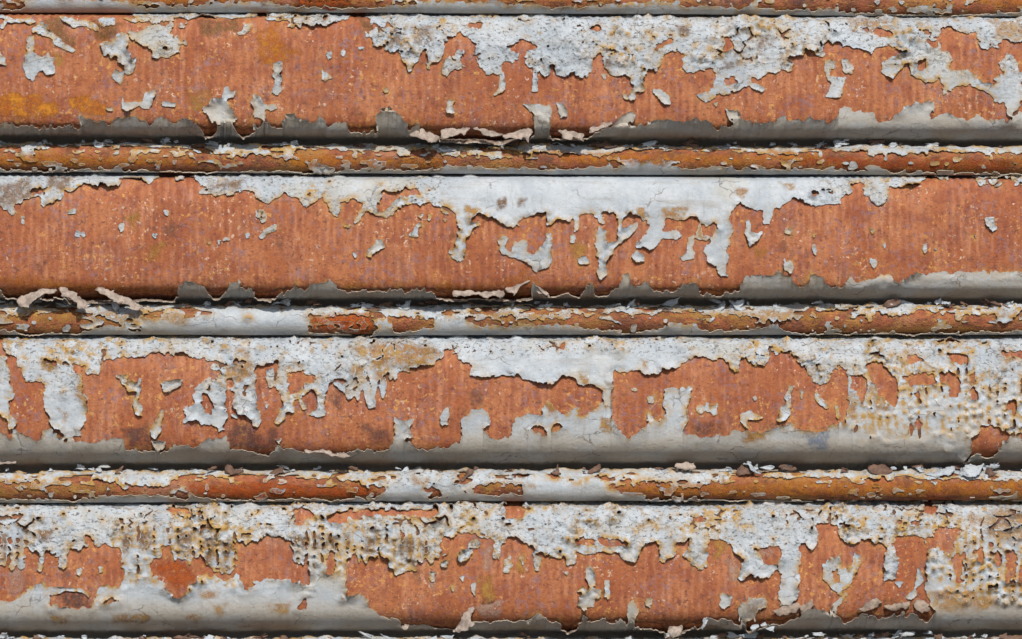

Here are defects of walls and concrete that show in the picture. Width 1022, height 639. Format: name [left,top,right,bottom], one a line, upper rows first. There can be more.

corrosion [46,18,75,45]
corrosion [92,20,118,40]
corrosion [0,92,58,118]
corrosion [0,154,192,189]
corrosion [554,150,1022,170]
corrosion [0,181,28,203]
corrosion [312,314,373,333]
corrosion [353,344,438,381]
peeling [0,258,1022,639]
corrosion [123,531,151,550]
corrosion [204,537,231,570]
corrosion [400,540,430,565]